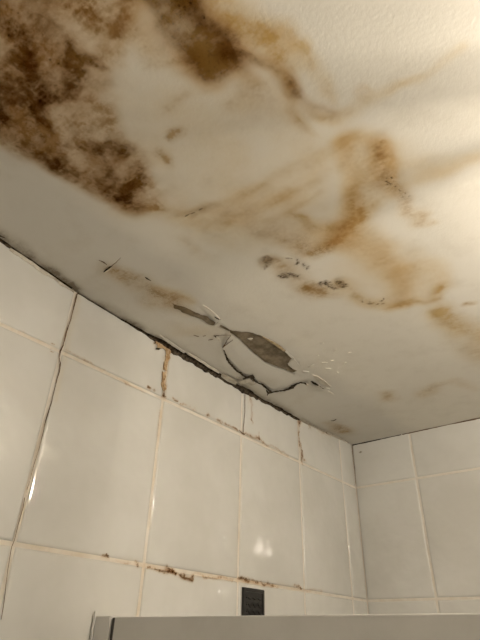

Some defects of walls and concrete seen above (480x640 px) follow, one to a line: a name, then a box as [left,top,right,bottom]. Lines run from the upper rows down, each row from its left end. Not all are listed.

damp [9,43,57,128]
damp [63,42,98,90]
damp [151,0,239,80]
damp [116,174,143,201]
peeling [172,303,334,395]
crack [0,235,480,619]